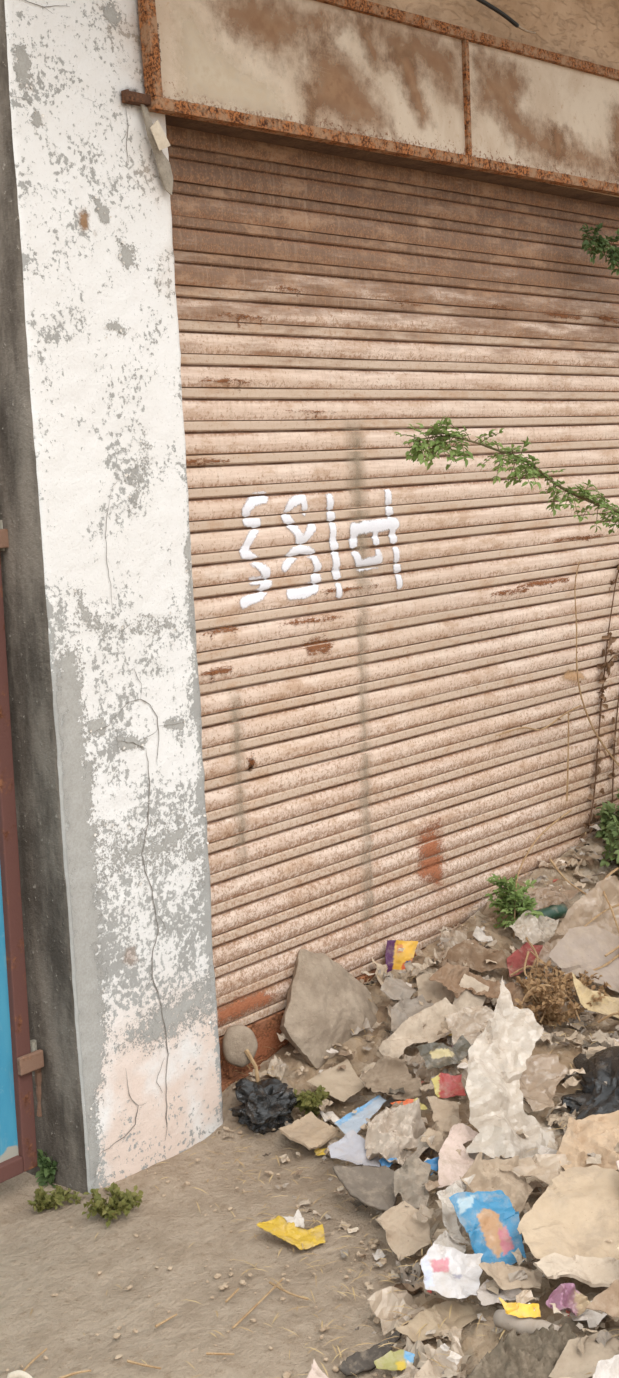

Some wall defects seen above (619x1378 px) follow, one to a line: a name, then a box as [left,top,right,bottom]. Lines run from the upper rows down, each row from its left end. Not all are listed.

peeling [101,0,122,32]
peeling [11,44,34,94]
peeling [31,109,45,128]
peeling [90,194,139,273]
peeling [104,319,129,339]
peeling [121,423,152,518]
peeling [54,518,217,1187]
corrosion [417,822,445,890]
crack [95,669,183,1154]
corrosion [217,990,288,1072]